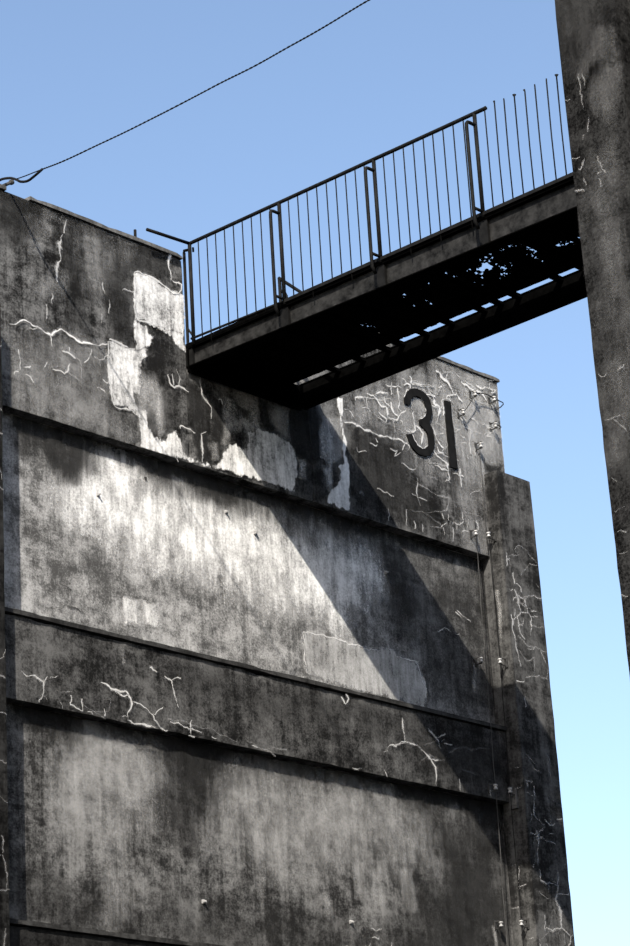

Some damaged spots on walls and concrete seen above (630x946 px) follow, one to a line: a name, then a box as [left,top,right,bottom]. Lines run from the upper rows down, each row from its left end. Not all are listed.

crack [12,222,109,392]
peeling [107,271,298,491]
peeling [327,398,350,511]
crack [344,370,496,487]
crack [70,667,216,739]
peeling [303,632,427,707]
crack [391,718,437,780]
water stain [16,706,511,946]